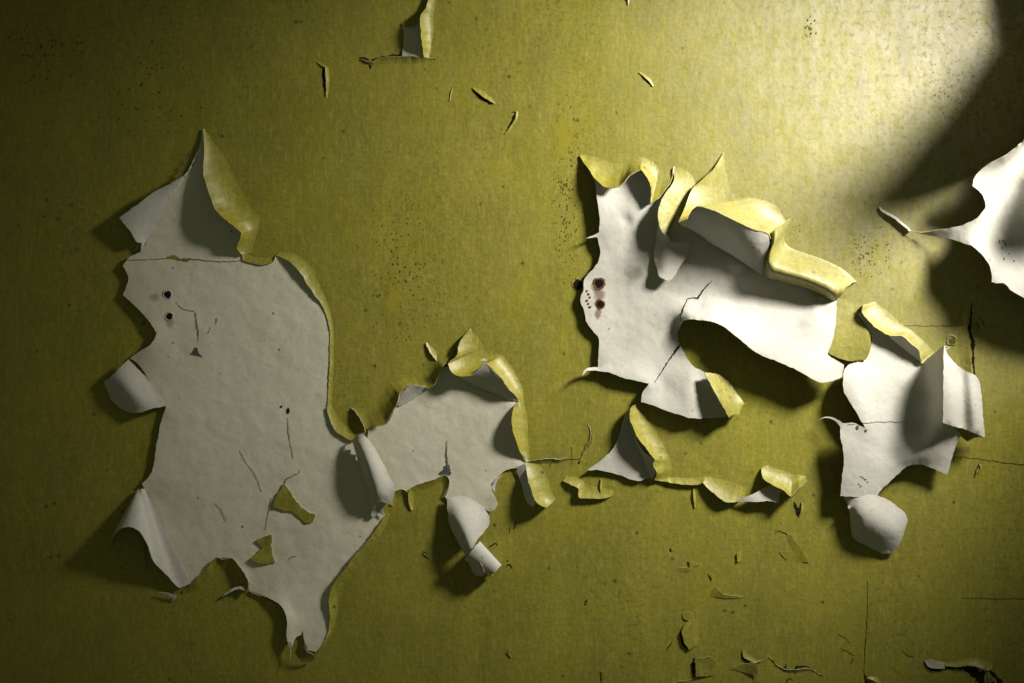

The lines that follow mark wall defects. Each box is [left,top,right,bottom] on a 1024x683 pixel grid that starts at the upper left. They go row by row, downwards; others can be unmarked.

peeling [359,0,435,69]
peeling [878,140,1024,298]
peeling [563,153,985,554]
crack [906,303,999,375]
peeling [104,129,568,662]
peeling [680,619,718,677]
peeling [924,658,1003,683]